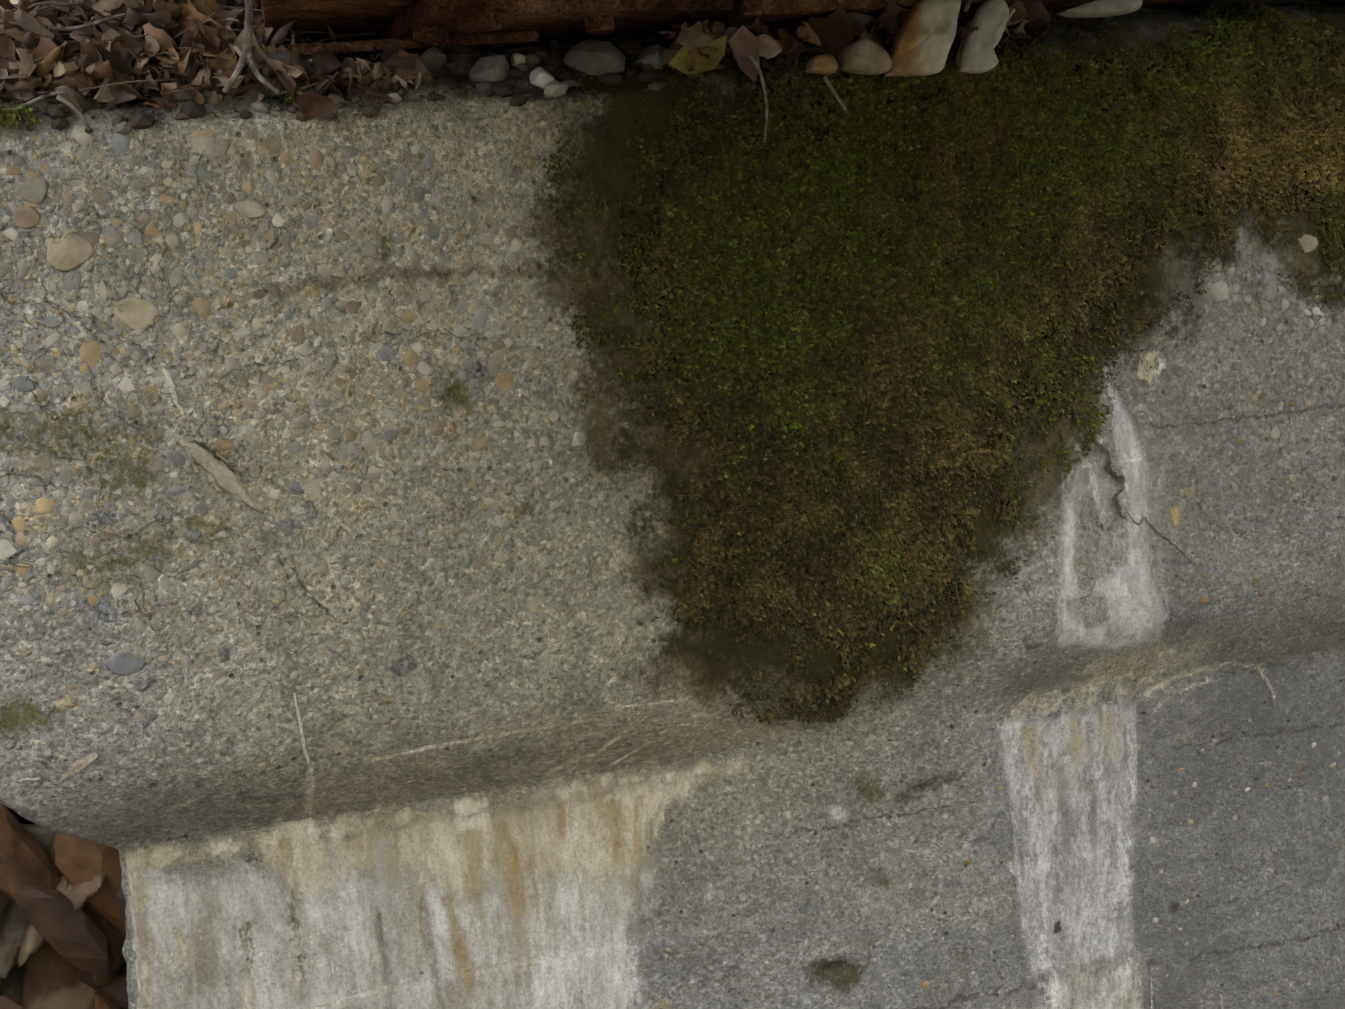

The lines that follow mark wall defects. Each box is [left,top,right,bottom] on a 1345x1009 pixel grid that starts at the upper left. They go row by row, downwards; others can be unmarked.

damp [1137,348,1165,384]
crack [1075,436,1192,562]
damp [997,365,1163,1009]
damp [1144,662,1225,708]
damp [125,758,743,1009]